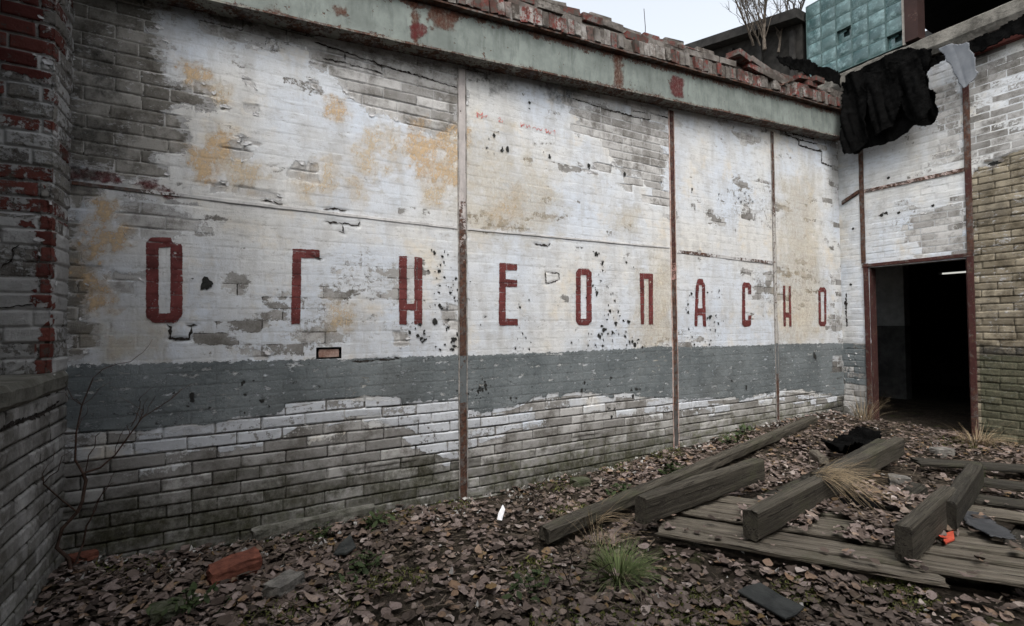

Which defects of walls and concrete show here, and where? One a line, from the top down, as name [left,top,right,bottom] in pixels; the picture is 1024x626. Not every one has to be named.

peeling [0,0,57,90]
rust [409,0,465,43]
rust [669,75,684,98]
peeling [18,0,230,368]
leakage [390,124,469,200]
peeling [557,85,683,220]